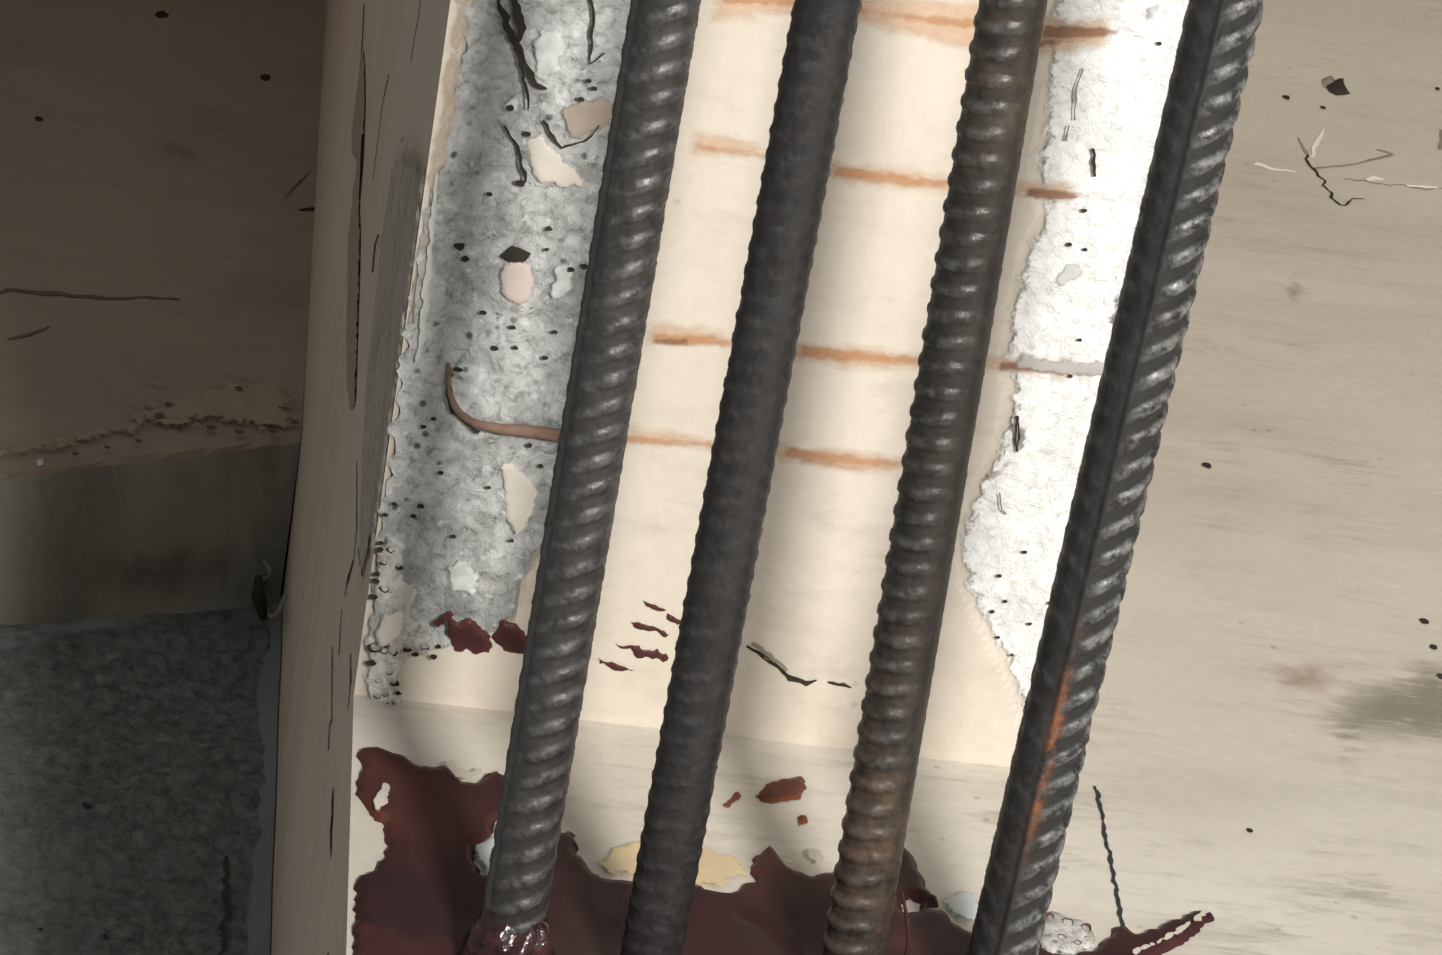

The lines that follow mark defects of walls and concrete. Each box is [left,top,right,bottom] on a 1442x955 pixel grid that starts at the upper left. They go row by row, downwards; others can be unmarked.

rust [718,0,795,15]
rust [858,0,978,45]
rust [1039,17,1112,51]
crack [1434,129,1442,150]
rust [830,164,949,188]
rust [1015,186,1077,199]
crack [1298,138,1442,206]
spalling [363,0,633,705]
rust [796,346,918,366]
spalling [961,0,1189,706]
spalling [0,377,302,466]
peeling [631,601,680,638]